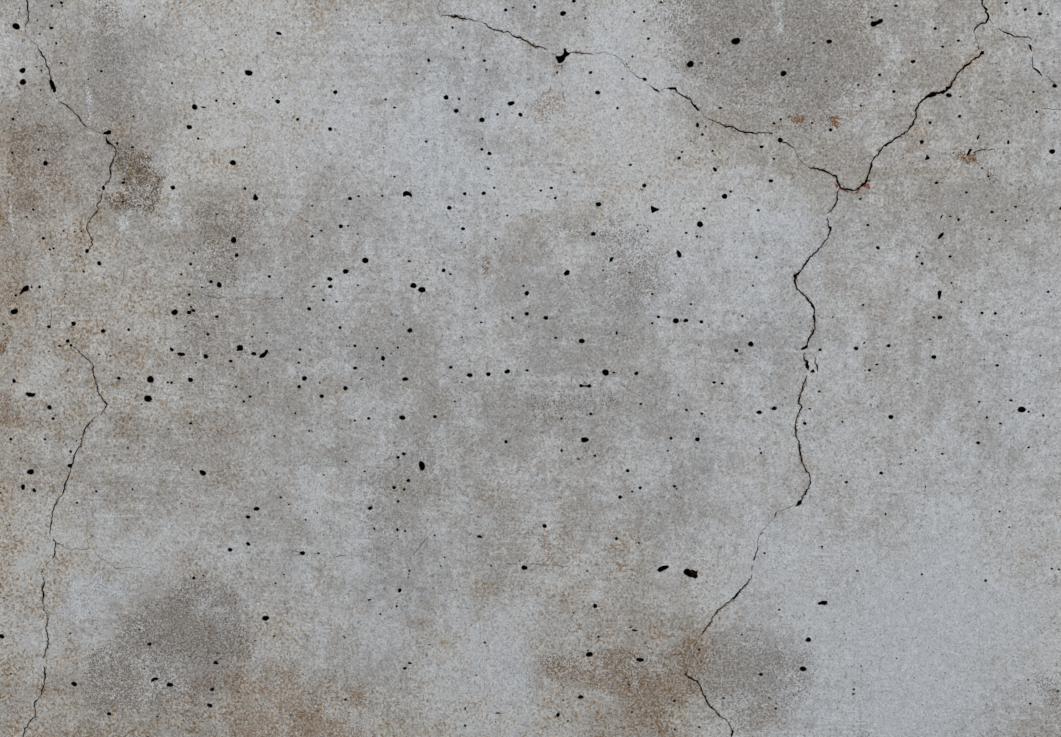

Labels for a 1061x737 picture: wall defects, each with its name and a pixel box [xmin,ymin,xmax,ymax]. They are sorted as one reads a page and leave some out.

crack [24,0,117,264]
crack [23,346,151,737]
crack [437,0,1055,737]